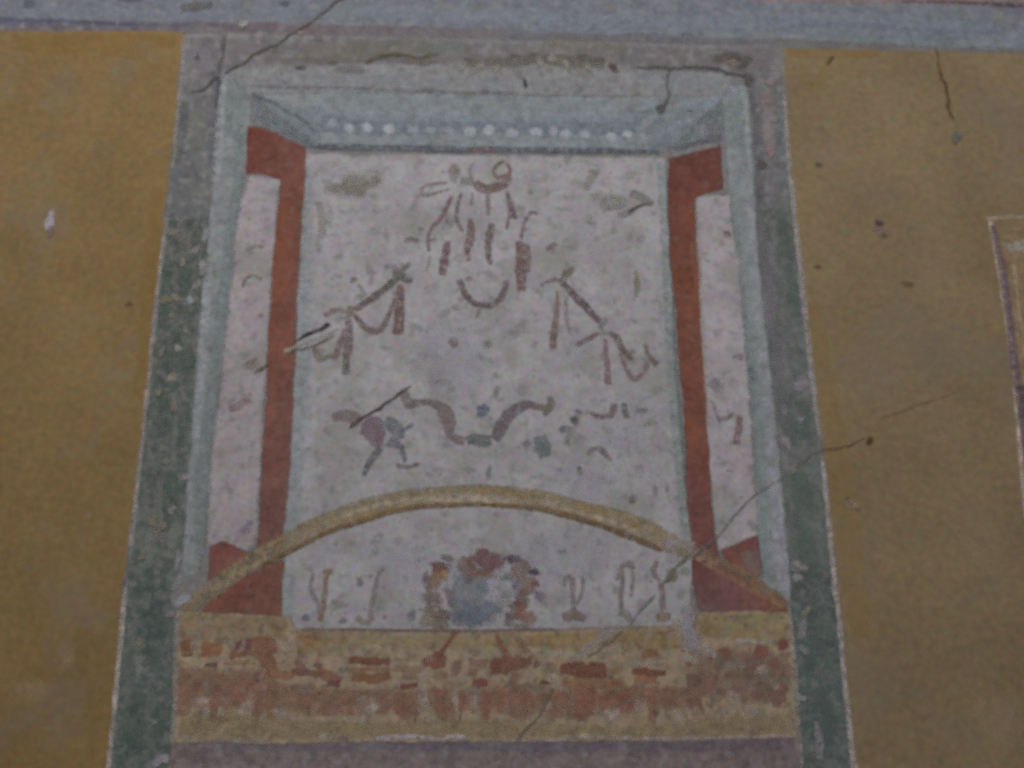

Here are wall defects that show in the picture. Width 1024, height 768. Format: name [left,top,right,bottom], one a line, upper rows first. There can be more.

crack [191,0,341,107]
crack [656,66,675,114]
crack [934,47,963,145]
crack [572,437,864,660]